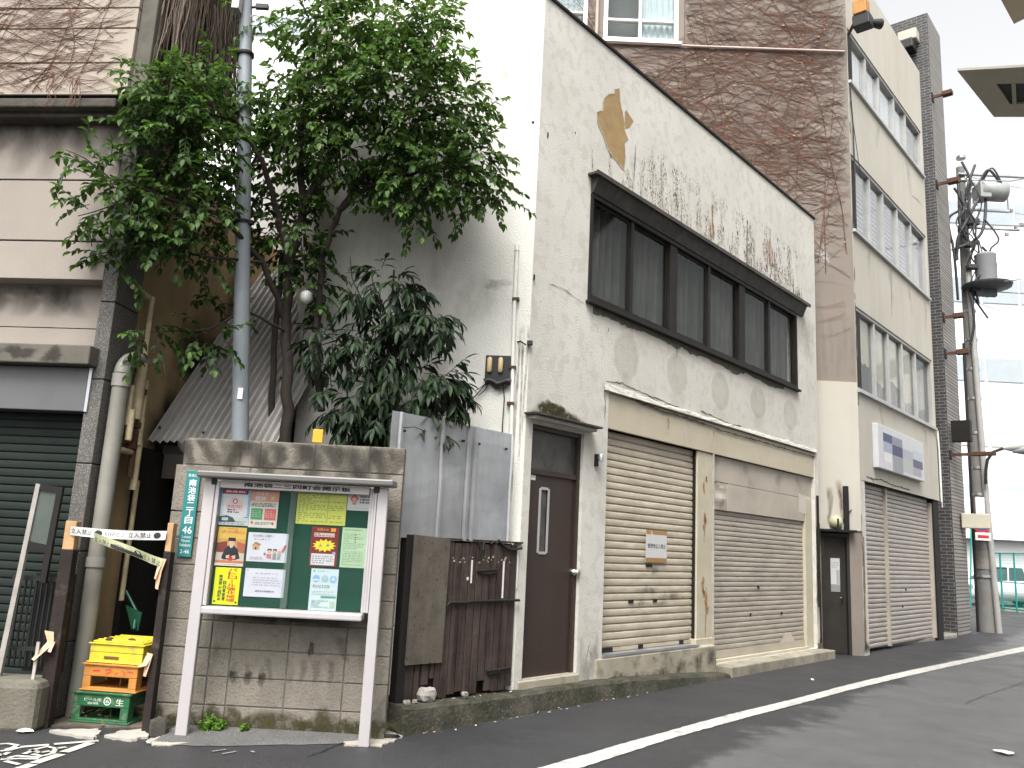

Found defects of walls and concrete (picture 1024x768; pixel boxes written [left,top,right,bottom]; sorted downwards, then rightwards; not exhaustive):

peeling [597,88,802,297]